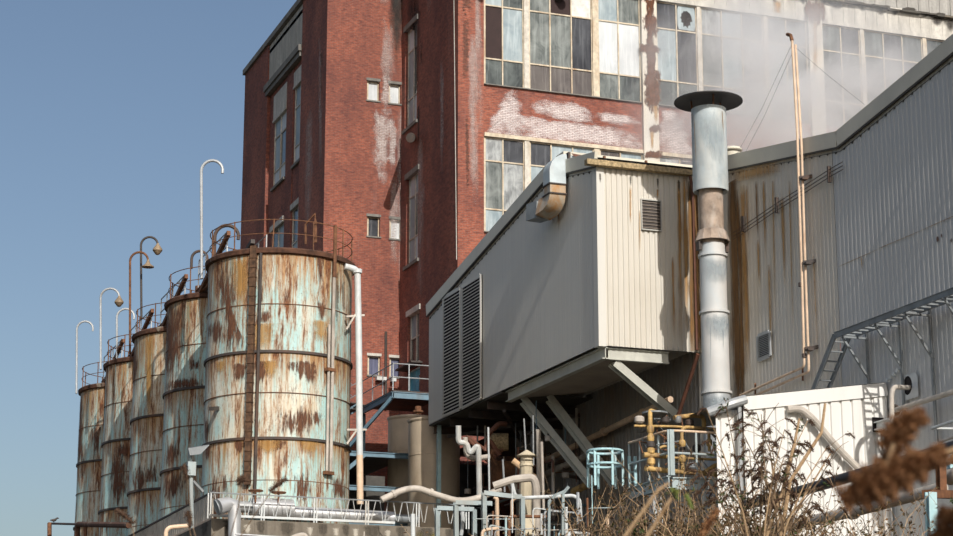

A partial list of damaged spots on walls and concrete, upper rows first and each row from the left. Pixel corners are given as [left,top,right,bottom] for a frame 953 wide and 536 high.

rust [640,0,663,158]
efflorescence [490,94,641,148]
efflorescence [376,115,401,232]
rust [728,165,792,396]
rust [165,303,202,389]
rust [208,260,276,382]
rust [289,361,316,382]
rust [77,403,101,468]
rust [261,407,321,451]
rust [110,442,186,505]
rust [294,472,311,502]
rust [330,475,345,498]